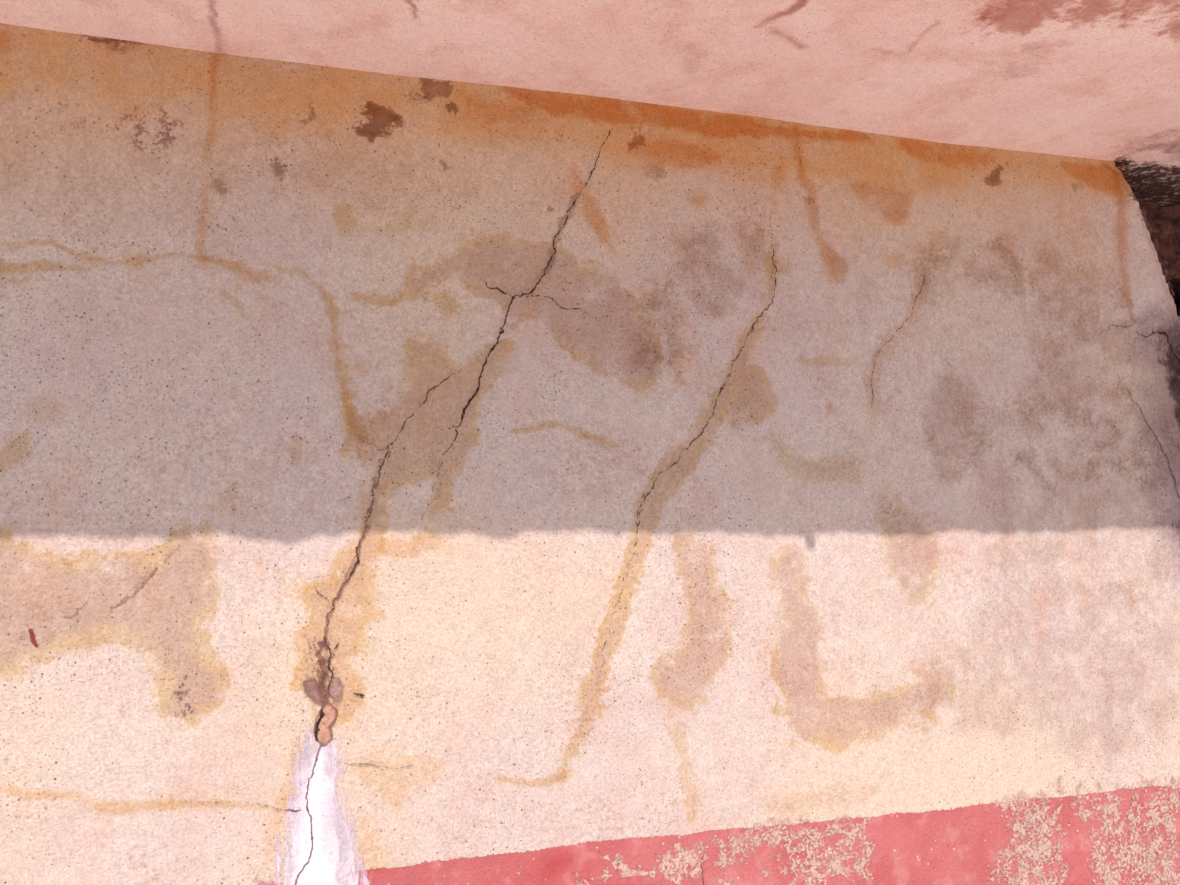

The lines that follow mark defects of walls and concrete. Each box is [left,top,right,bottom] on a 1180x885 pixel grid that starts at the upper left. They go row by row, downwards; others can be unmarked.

crack [616,233,777,604]
crack [1101,324,1180,360]
crack [1129,394,1180,498]
damp [1167,336,1180,423]
crack [190,130,610,885]
damp [261,731,369,885]
peeling [576,815,880,885]
peeling [987,774,1180,885]